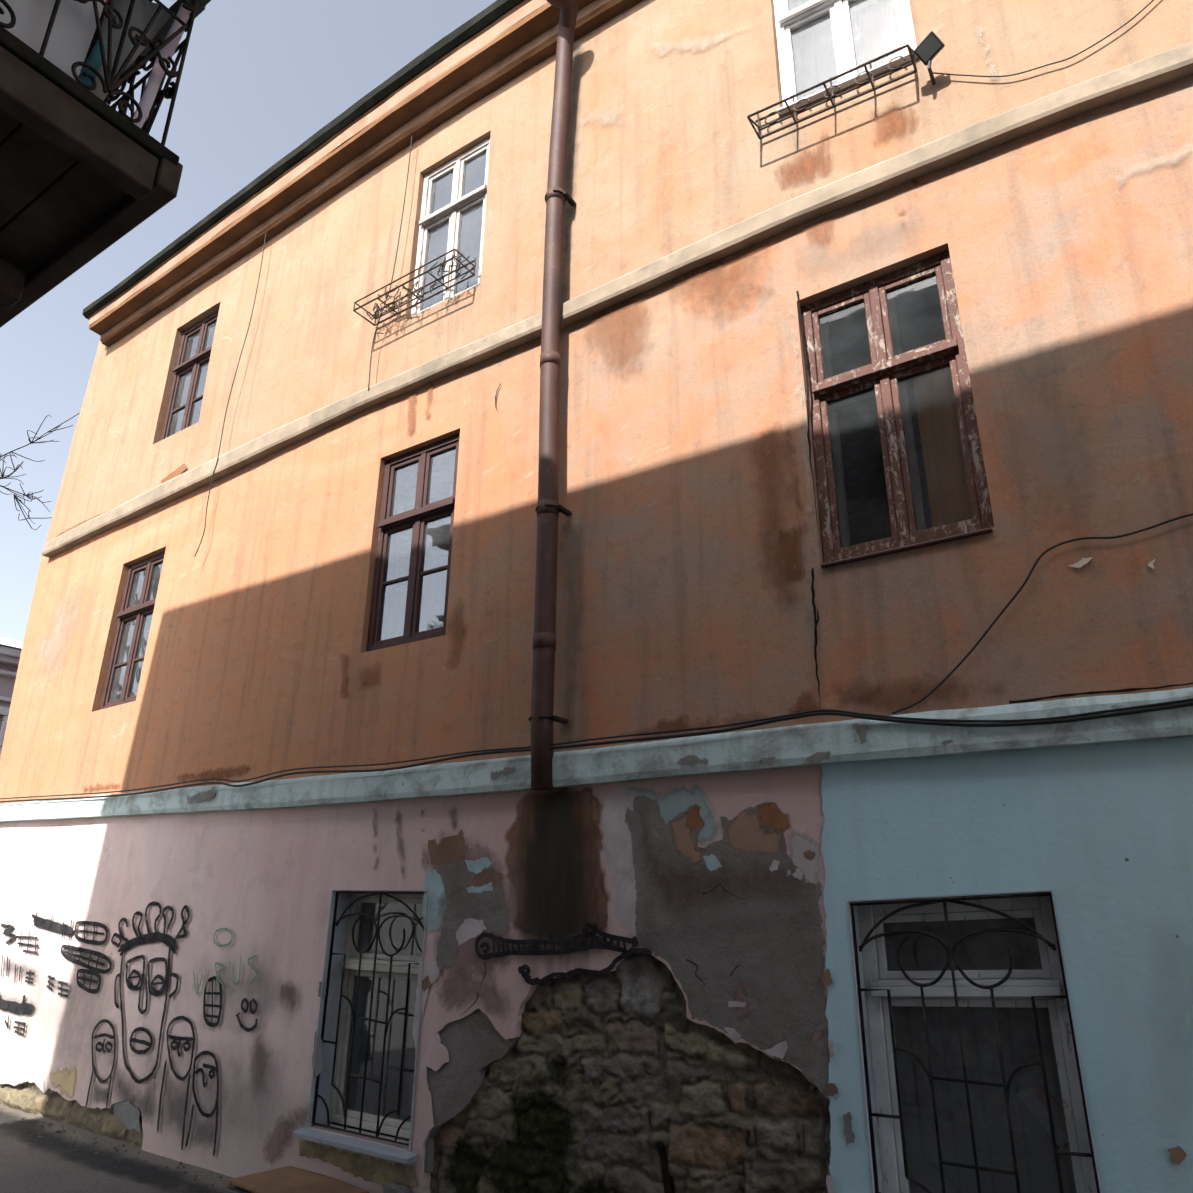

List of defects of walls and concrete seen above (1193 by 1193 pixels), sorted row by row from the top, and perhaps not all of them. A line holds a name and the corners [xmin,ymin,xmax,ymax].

flaking render [298,787,855,1193]